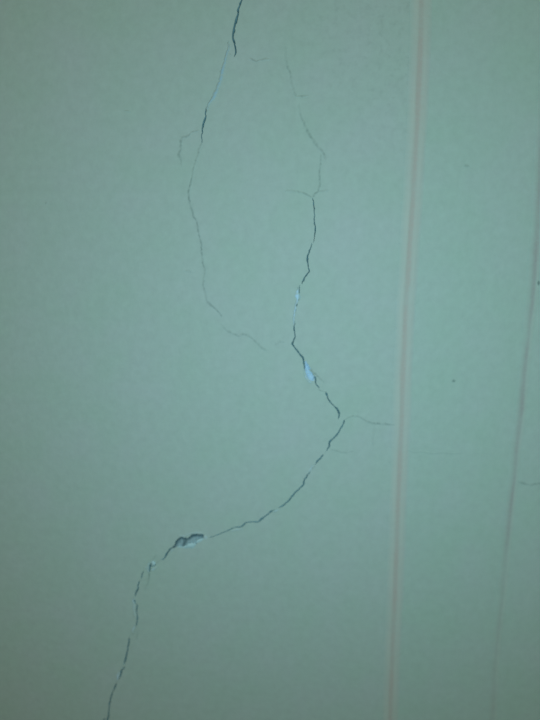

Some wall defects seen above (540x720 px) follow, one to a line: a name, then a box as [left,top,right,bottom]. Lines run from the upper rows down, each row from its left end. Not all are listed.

crack [177,0,395,538]
crack [104,547,174,720]